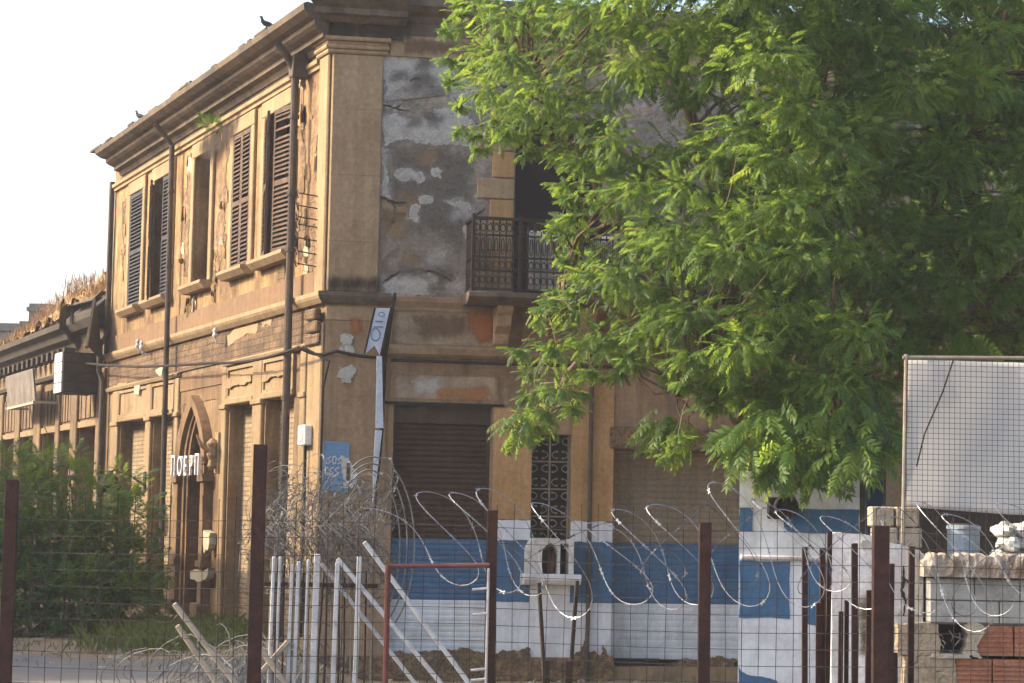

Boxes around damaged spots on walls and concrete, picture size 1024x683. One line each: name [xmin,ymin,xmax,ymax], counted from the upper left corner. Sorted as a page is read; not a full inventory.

flaking render [381,53,480,233]
flaking render [210,124,230,303]
crack [383,268,452,283]
flaking render [383,267,466,297]
flaking render [337,333,356,383]